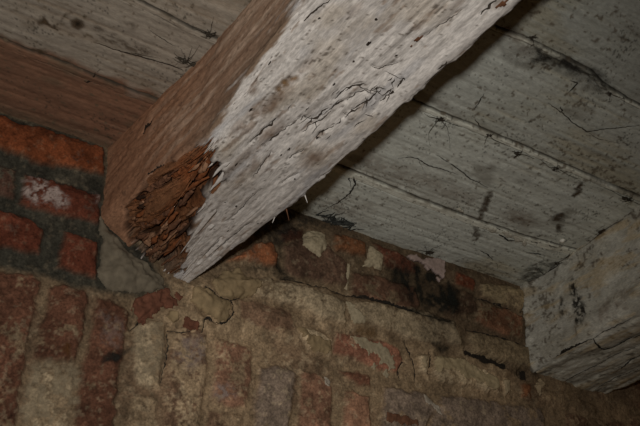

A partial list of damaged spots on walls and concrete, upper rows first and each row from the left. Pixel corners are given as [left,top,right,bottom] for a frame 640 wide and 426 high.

crack [202,63,403,258]
efflorescence [23,179,67,206]
peeling [406,254,446,283]
crack [282,279,428,316]
water stain [393,265,458,322]
crack [160,286,239,383]
peeling [350,335,396,378]